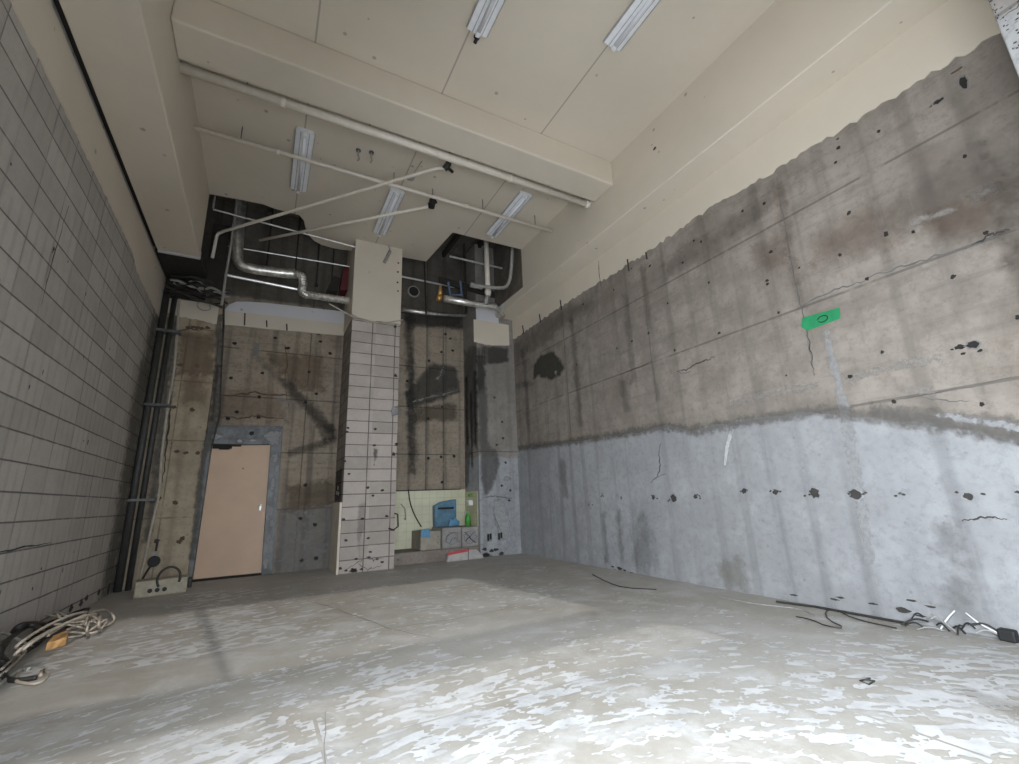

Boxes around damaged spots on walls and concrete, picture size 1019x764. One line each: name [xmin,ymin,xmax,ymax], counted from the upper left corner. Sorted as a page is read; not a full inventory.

leakage [911,208,955,226]
leakage [533,352,564,380]